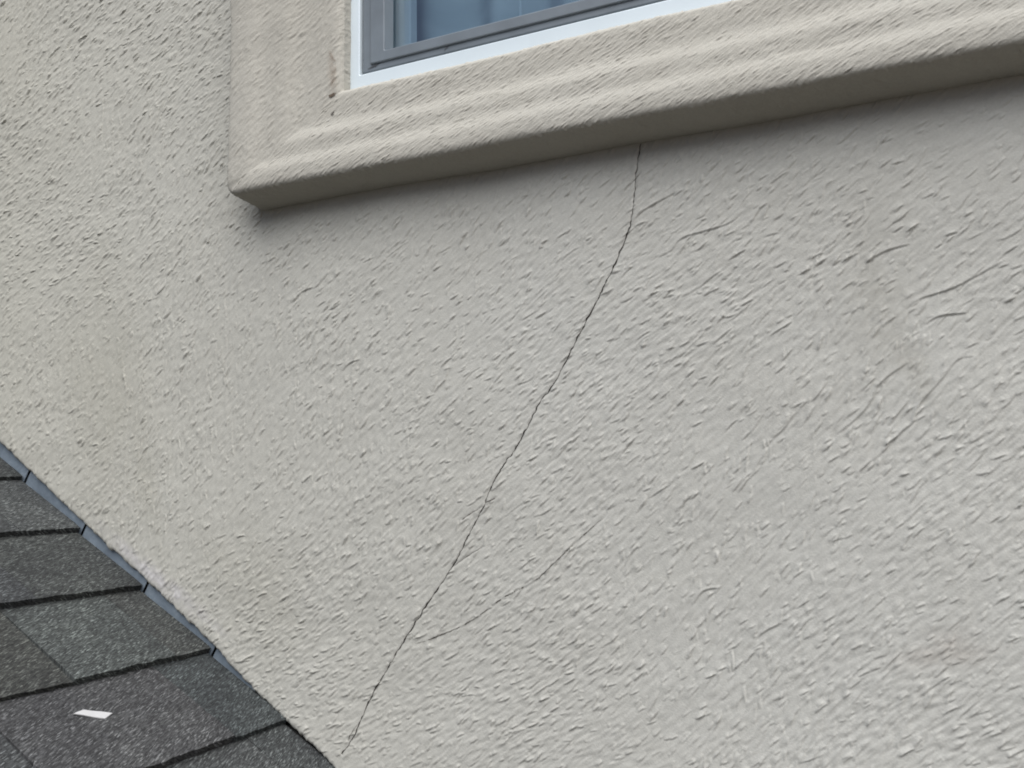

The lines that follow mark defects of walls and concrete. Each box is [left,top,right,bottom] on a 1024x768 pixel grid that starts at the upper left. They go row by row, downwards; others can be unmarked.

crack [342,144,641,753]